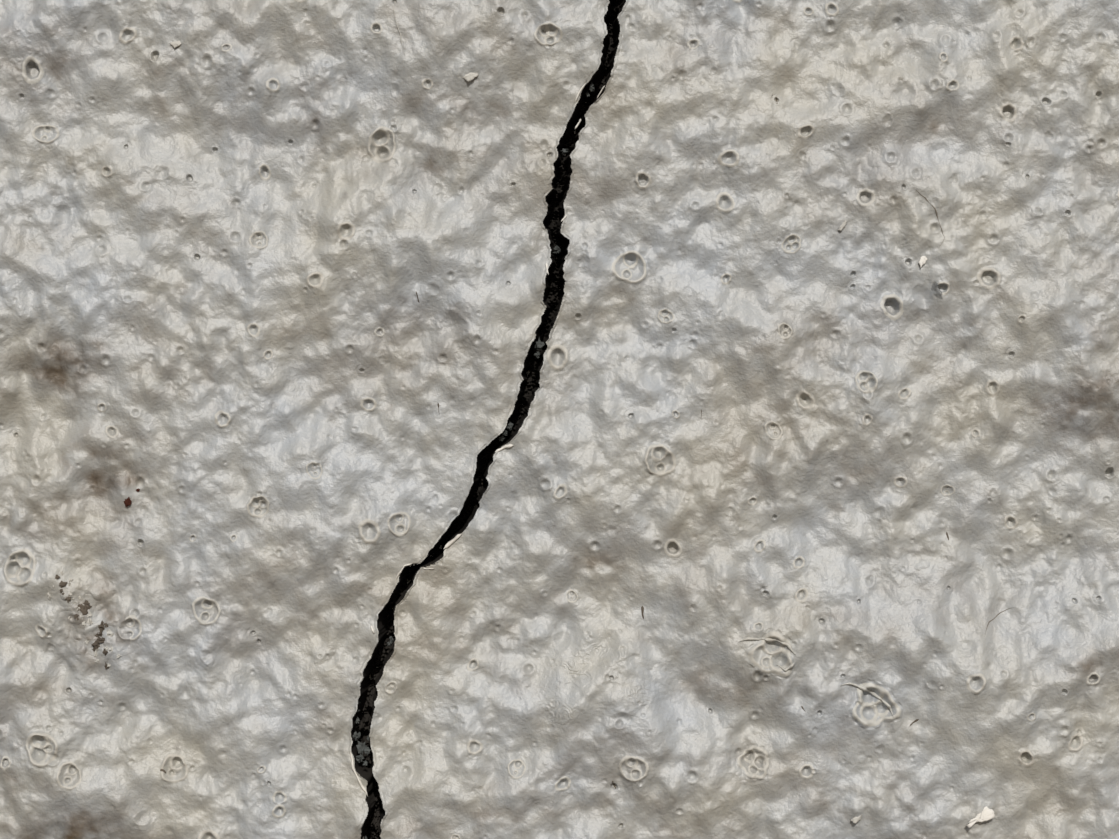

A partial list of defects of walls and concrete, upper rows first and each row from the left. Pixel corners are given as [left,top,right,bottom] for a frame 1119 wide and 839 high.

crack [348,0,629,839]